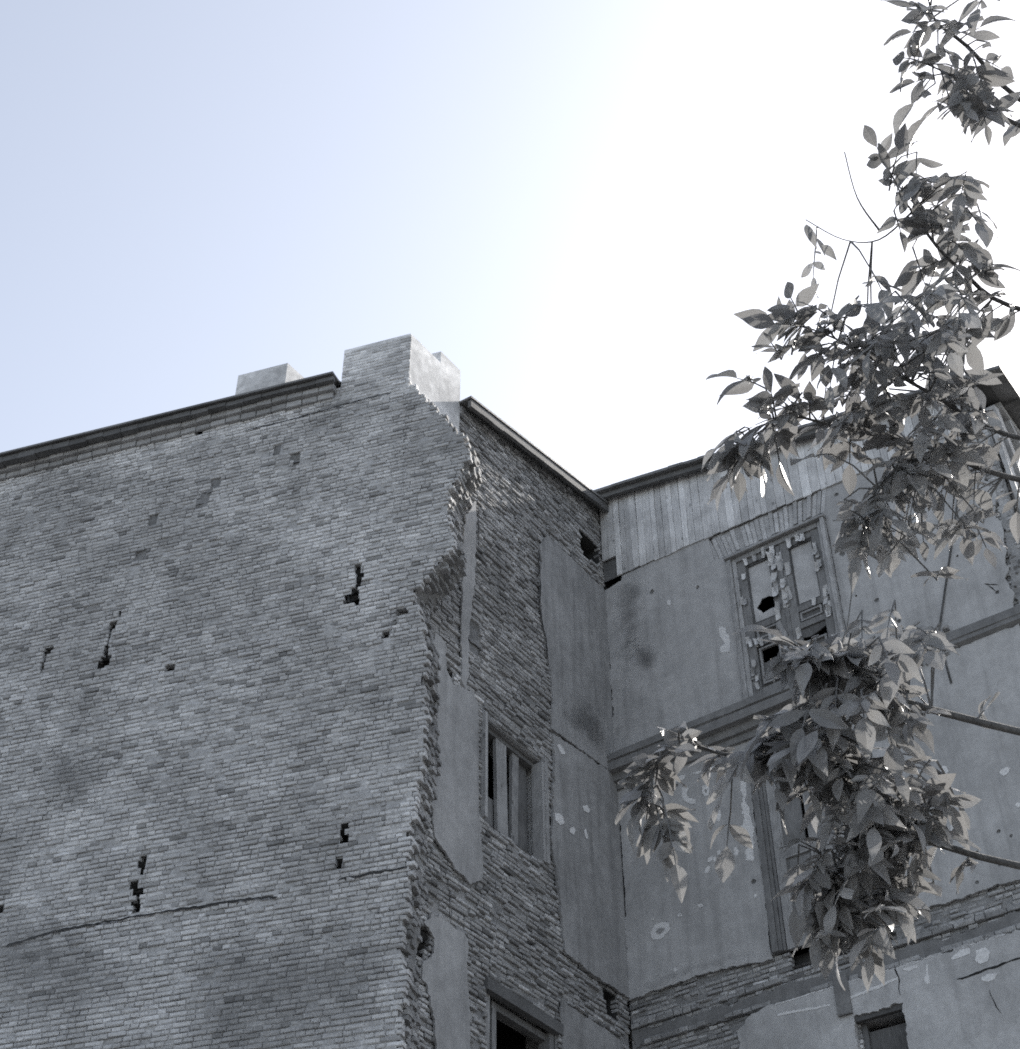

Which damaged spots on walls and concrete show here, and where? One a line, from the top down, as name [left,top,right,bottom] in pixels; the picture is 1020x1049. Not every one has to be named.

spalling [196,478,221,509]
spalling [344,567,364,605]
spalling [97,622,116,669]
peeling [676,765,715,804]
spalling [340,823,349,844]
peeling [734,781,755,861]
spalling [130,859,147,913]
spalling [416,929,430,957]
peeling [649,913,682,940]
crack [958,957,1020,1013]